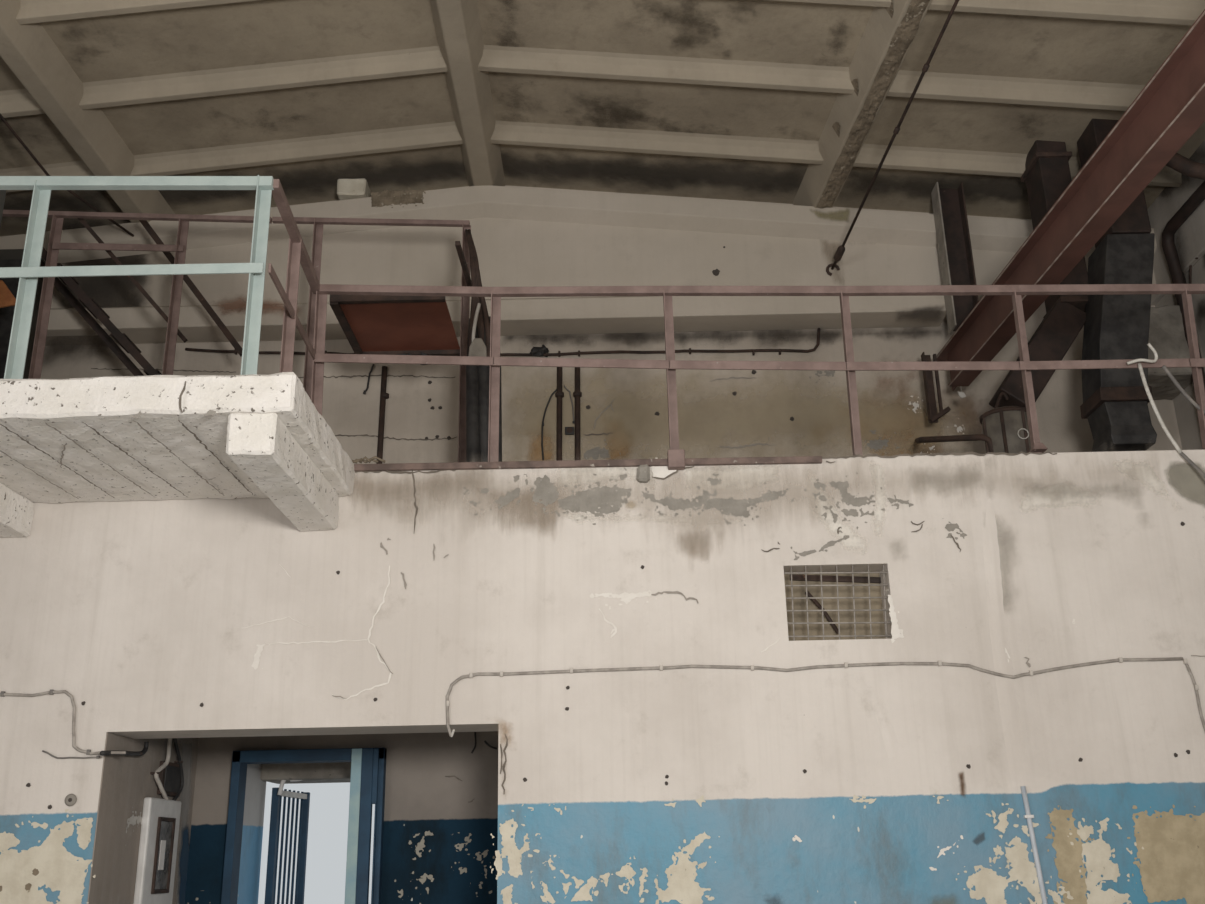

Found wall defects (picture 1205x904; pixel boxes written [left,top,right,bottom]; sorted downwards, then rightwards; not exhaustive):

crack [335,433,456,441]
damp [558,467,653,491]
flaking render [463,458,914,560]
damp [524,379,940,457]
damp [656,465,886,552]
flaking render [943,518,967,540]
damp [1116,461,1205,505]
crack [254,470,456,700]
peeling [0,809,96,904]
peeling [394,831,434,904]
peeling [451,802,720,904]
peeling [956,803,1144,904]